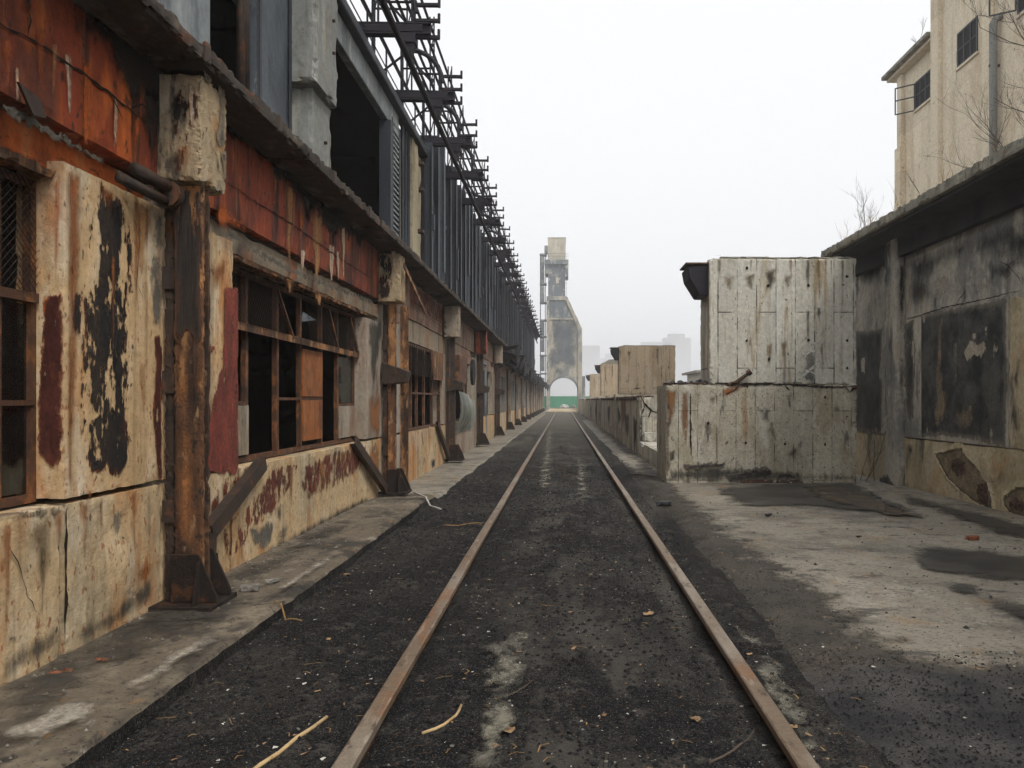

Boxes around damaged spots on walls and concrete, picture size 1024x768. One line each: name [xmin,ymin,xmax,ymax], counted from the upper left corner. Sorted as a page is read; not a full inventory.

corrosion [218,206,244,229]
peeling [37,181,132,476]
corrosion [667,391,688,437]
damp [935,319,958,423]
peeling [904,299,1024,516]
corrosion [180,462,190,539]
peeling [224,447,366,556]
crack [10,549,38,613]